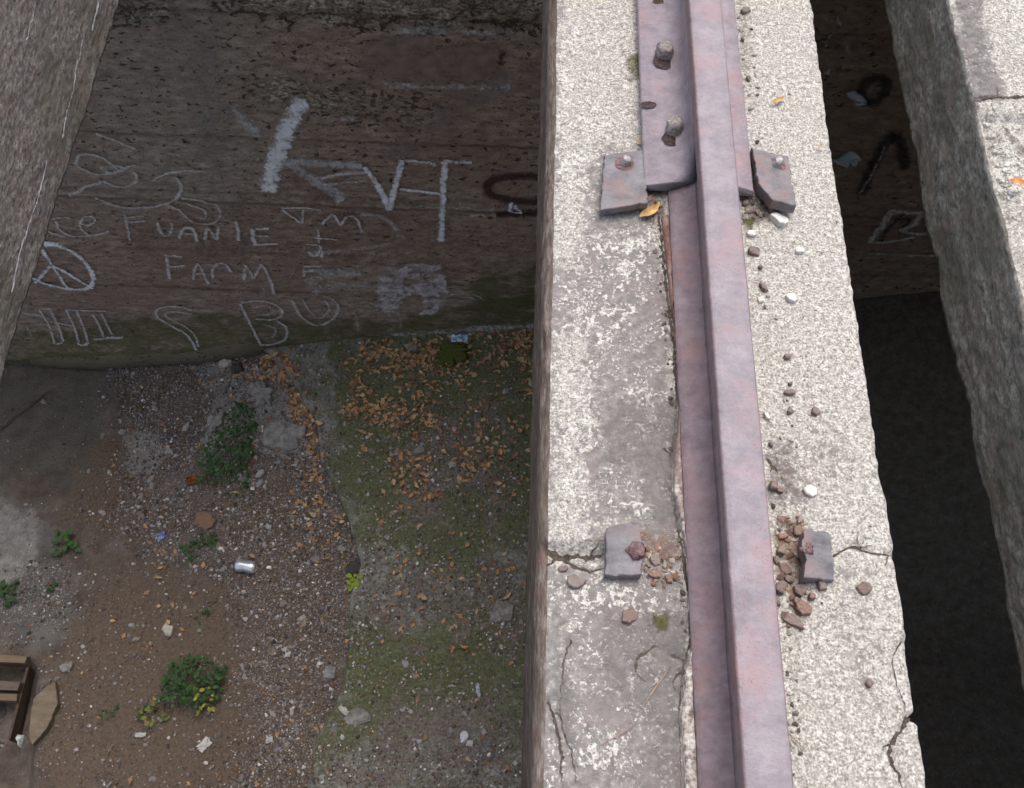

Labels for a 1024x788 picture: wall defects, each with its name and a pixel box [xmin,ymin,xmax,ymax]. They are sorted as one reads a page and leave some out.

corrosion [615,156,634,171]
crack [546,540,605,573]
crack [833,541,892,565]
crack [547,640,578,787]
crack [883,642,910,788]